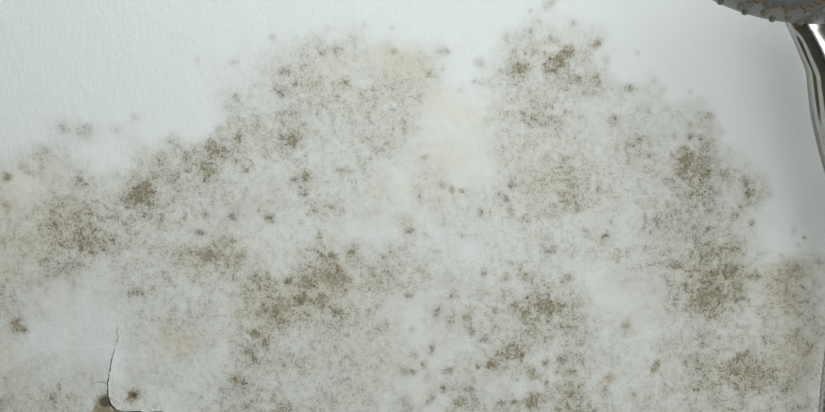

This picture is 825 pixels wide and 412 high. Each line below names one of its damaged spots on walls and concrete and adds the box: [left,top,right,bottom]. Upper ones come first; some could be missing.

leakage [507,50,535,85]
leakage [542,45,601,95]
leakage [276,111,304,157]
leakage [29,131,249,320]
leakage [643,134,762,322]
crack [95,328,118,409]
leakage [95,394,118,412]
leakage [126,390,141,402]
leakage [220,376,292,412]
leakage [236,232,394,375]
leakage [400,266,597,412]
leakage [683,333,804,411]